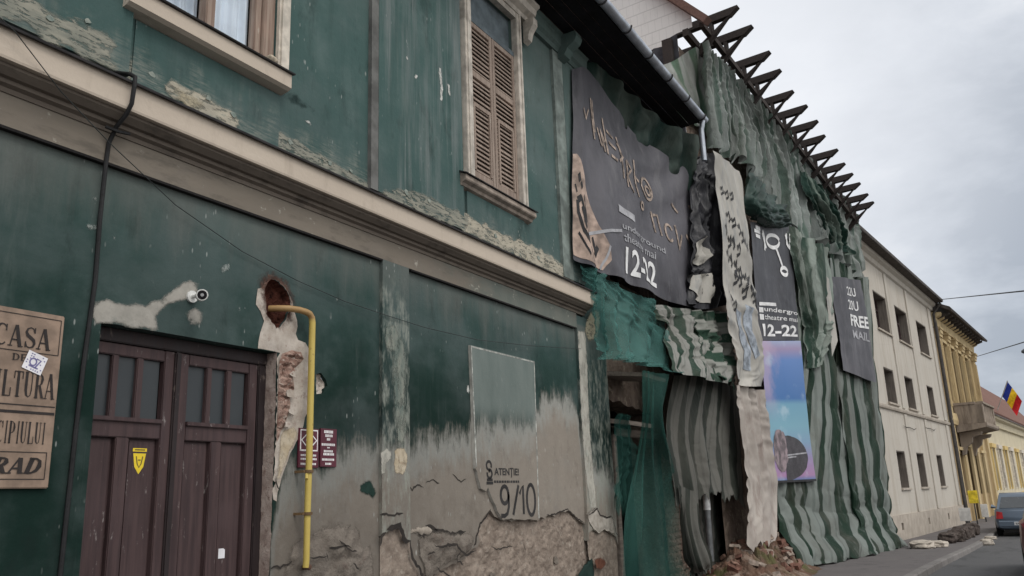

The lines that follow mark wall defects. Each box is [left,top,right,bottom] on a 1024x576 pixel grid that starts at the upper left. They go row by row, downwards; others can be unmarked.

peeling [0,0,132,80]
peeling [165,81,239,128]
peeling [278,132,368,188]
peeling [384,189,572,281]
spalling [256,279,324,576]
peeling [381,325,407,475]
spalling [433,313,618,576]
spalling [380,528,418,576]